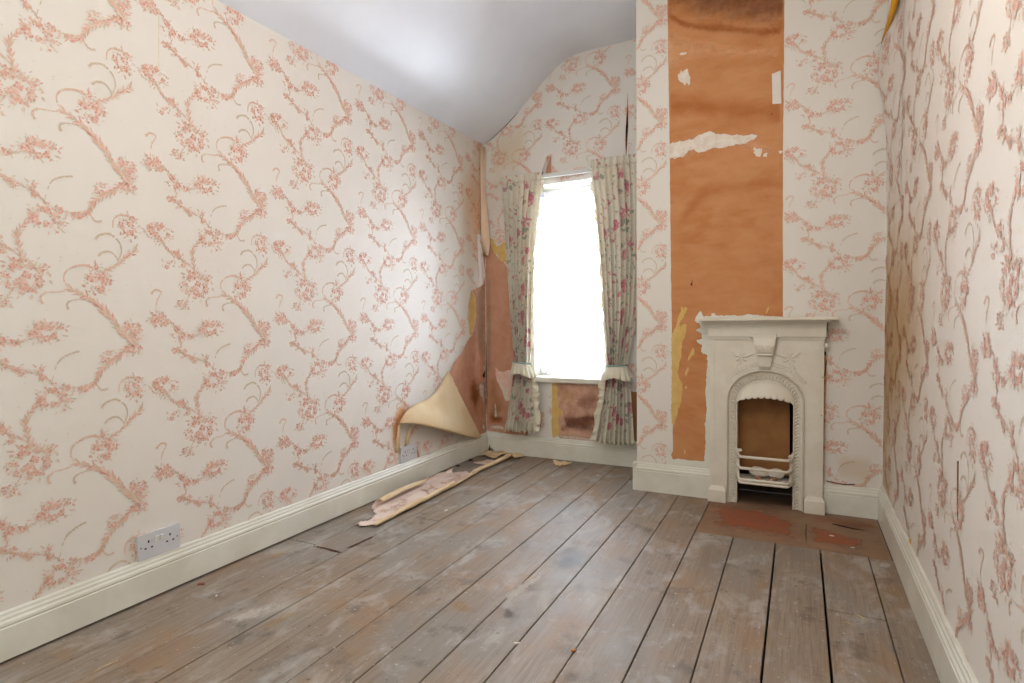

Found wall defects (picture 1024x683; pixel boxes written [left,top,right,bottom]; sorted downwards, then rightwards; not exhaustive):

peeling [881,0,900,43]
flaking render [395,146,528,452]
flaking render [556,383,608,443]
flaking render [667,0,784,461]